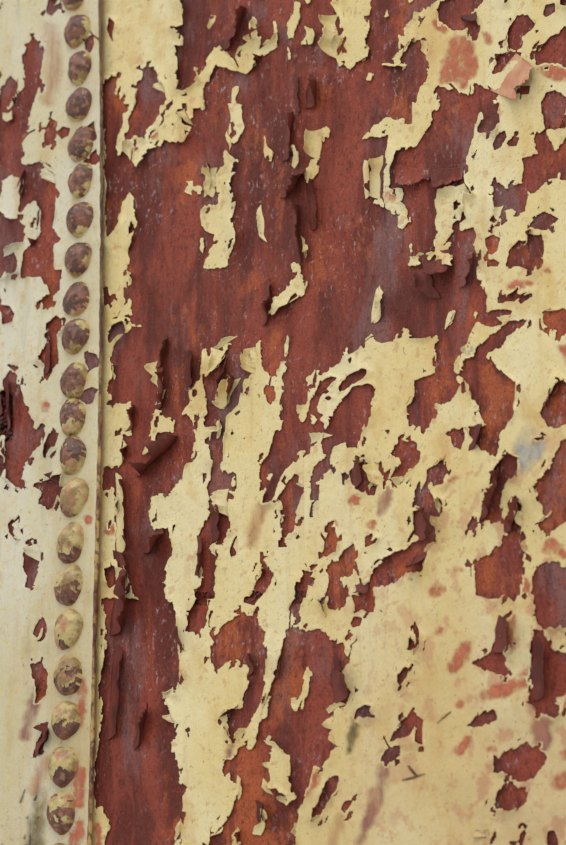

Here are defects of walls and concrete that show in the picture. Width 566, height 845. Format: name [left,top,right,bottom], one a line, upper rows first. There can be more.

peeling [440,37,478,88]
rust [530,26,566,69]
peeling [541,64,566,80]
rust [484,90,566,276]
rust [0,365,63,510]
rust [94,0,539,845]
rust [534,377,566,440]
peeling [544,538,566,558]
rust [465,439,566,816]
peeling [449,642,470,672]
peeling [487,670,528,698]
peeling [455,736,470,754]